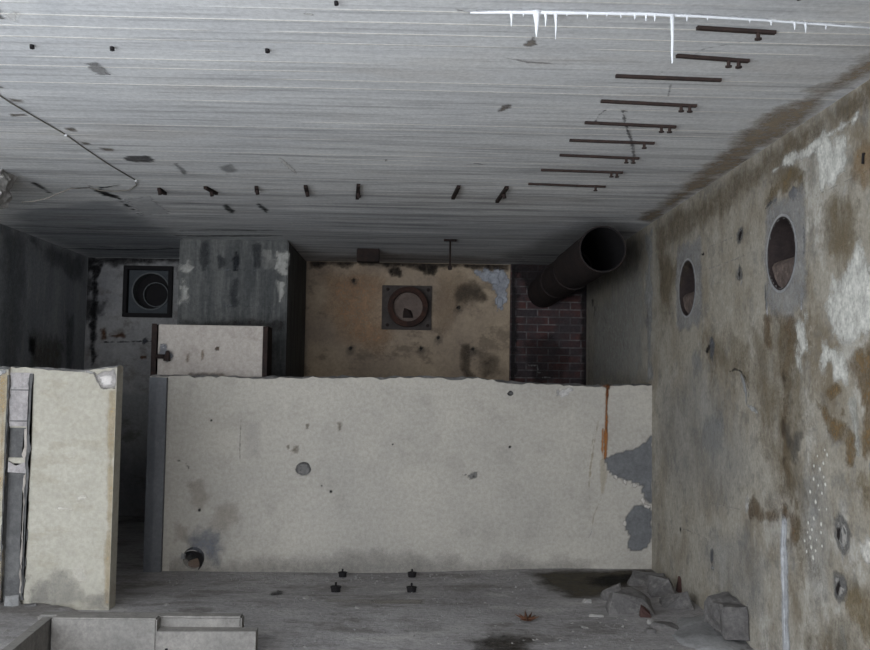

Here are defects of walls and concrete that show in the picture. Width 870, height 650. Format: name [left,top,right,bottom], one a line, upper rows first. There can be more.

damp [456,284,486,302]
peeling [474,269,509,310]
damp [461,345,474,377]
corrosion [601,385,610,459]
damp [745,288,801,650]
peeling [605,436,652,551]
hole [834,515,850,555]
hole [834,574,847,602]